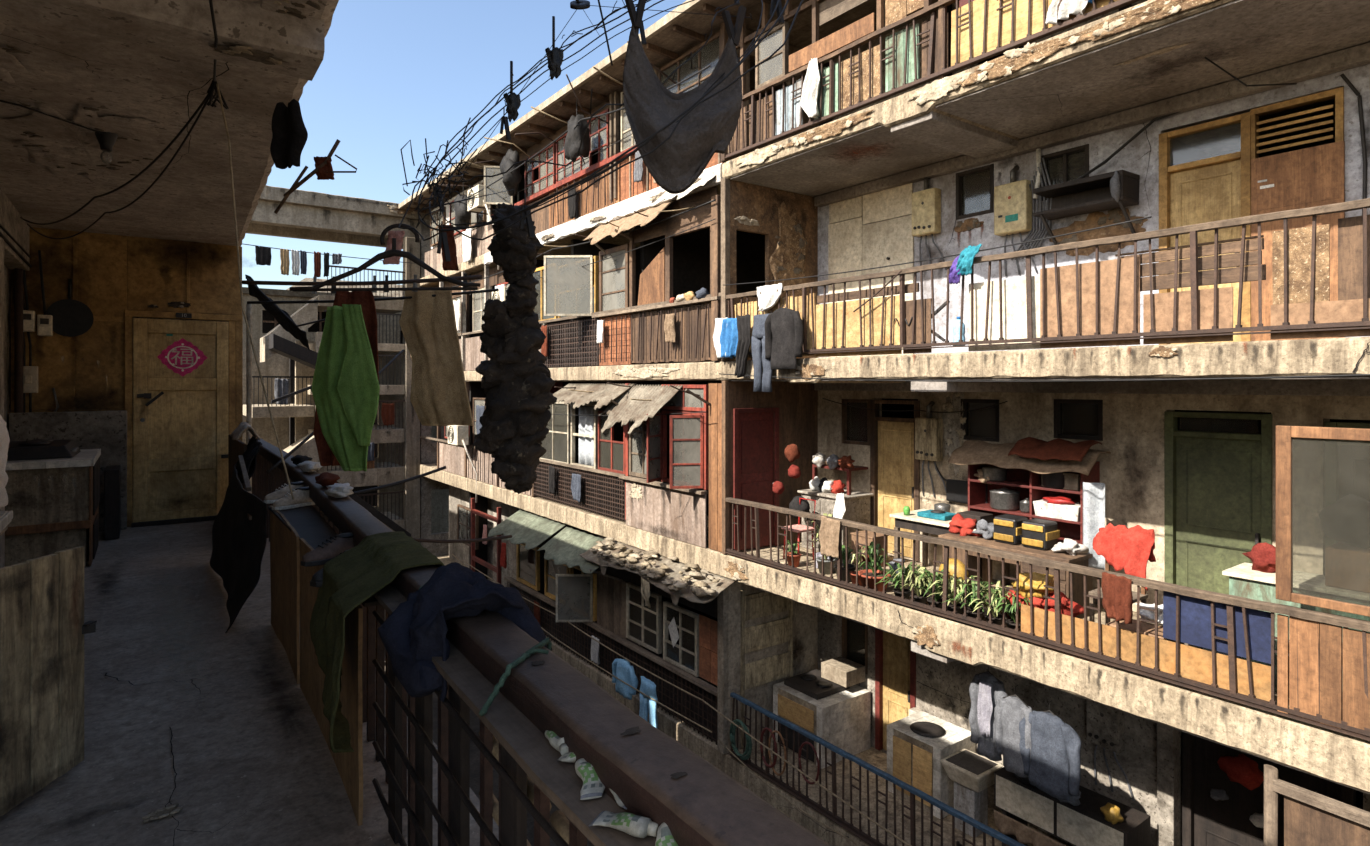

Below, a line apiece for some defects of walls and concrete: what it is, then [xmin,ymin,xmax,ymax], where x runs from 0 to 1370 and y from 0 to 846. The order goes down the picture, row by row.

spalling [907,0,1216,105]
crack [165,727,280,846]